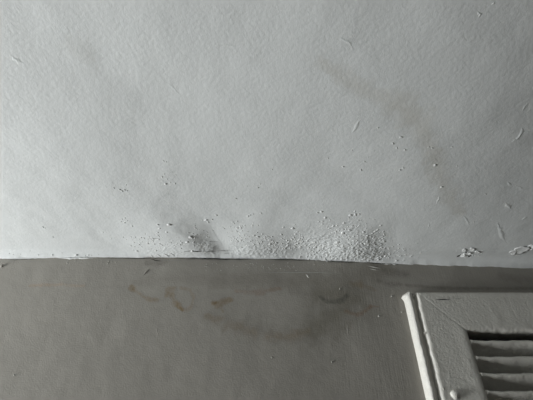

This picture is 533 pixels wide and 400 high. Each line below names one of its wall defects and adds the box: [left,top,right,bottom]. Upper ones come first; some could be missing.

water stain [127,259,533,360]